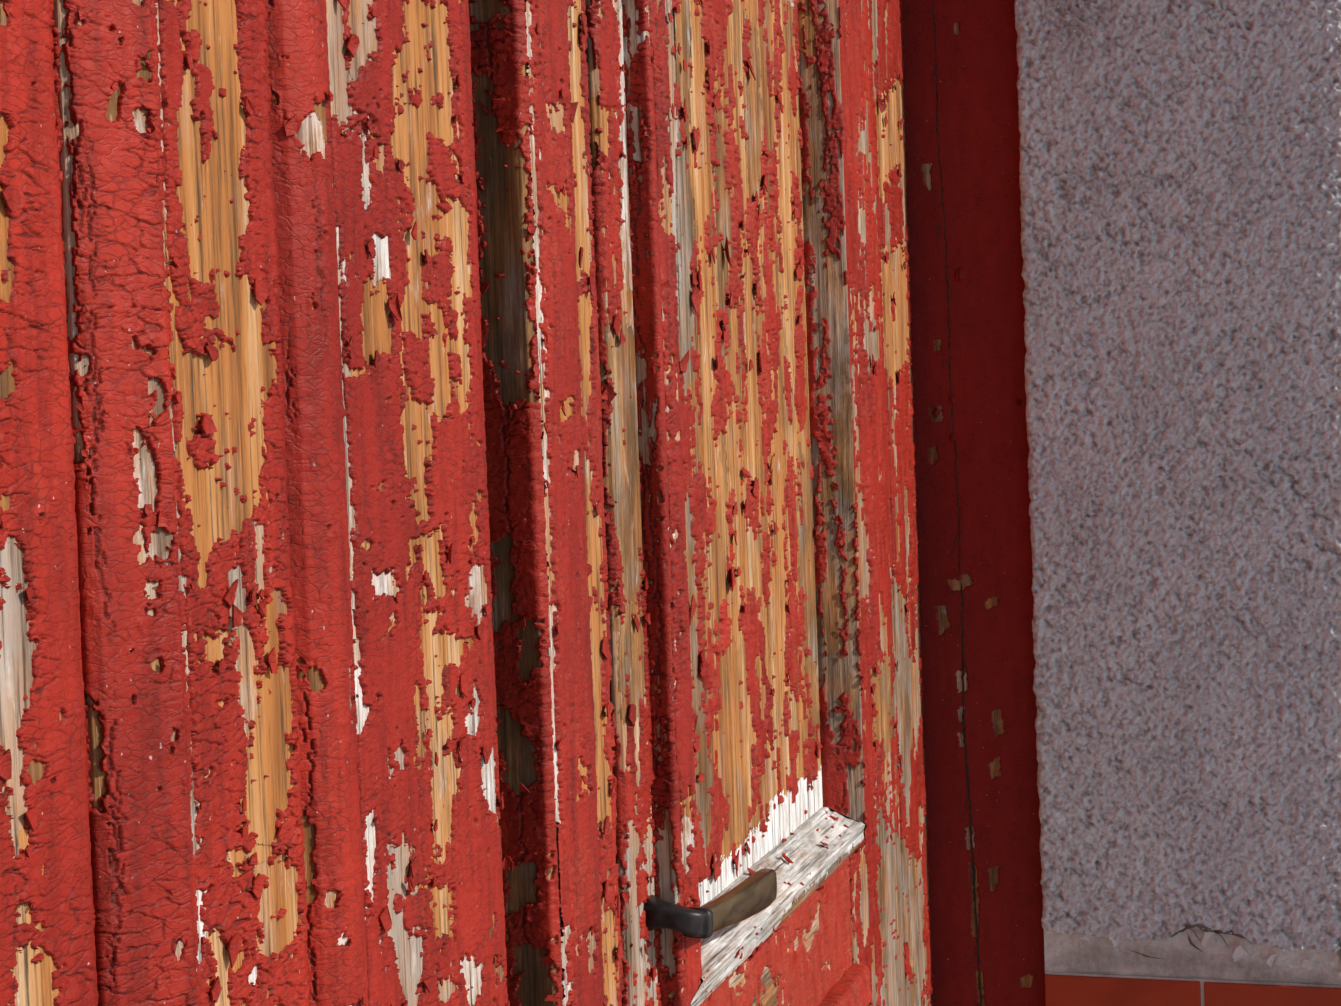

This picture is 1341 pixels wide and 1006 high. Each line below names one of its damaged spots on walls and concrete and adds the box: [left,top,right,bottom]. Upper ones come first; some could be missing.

peeling [0,1,9,26]
peeling [0,115,9,168]
peeling [0,184,26,303]
peeling [53,0,90,462]
peeling [922,163,932,190]
peeling [0,361,16,409]
peeling [106,0,345,1006]
peeling [284,0,929,1006]
peeling [0,494,60,859]
peeling [85,694,111,814]
peeling [7,902,63,1006]